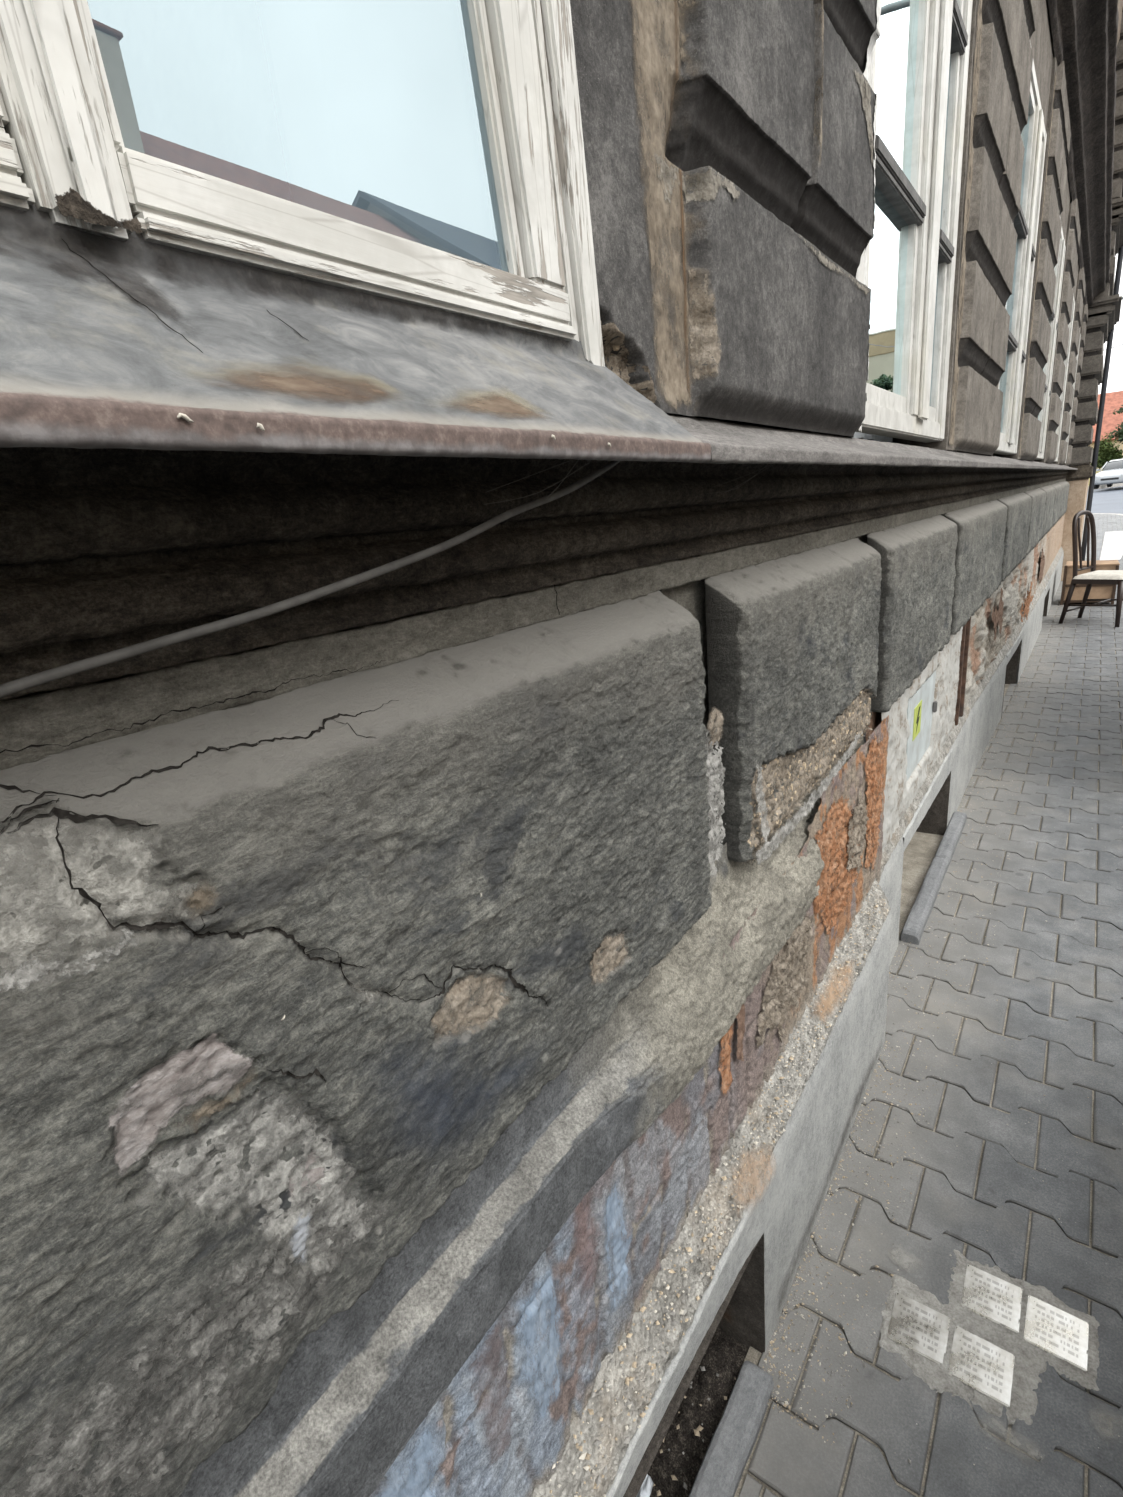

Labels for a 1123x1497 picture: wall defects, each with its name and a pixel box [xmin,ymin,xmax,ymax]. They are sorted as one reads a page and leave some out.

corrosion [236,372,390,401]
crack [0,660,548,1006]
peeling [705,708,726,878]
spalling [747,689,873,872]
spalling [431,974,509,1035]
spalling [590,933,630,982]
spalling [0,1033,388,1497]